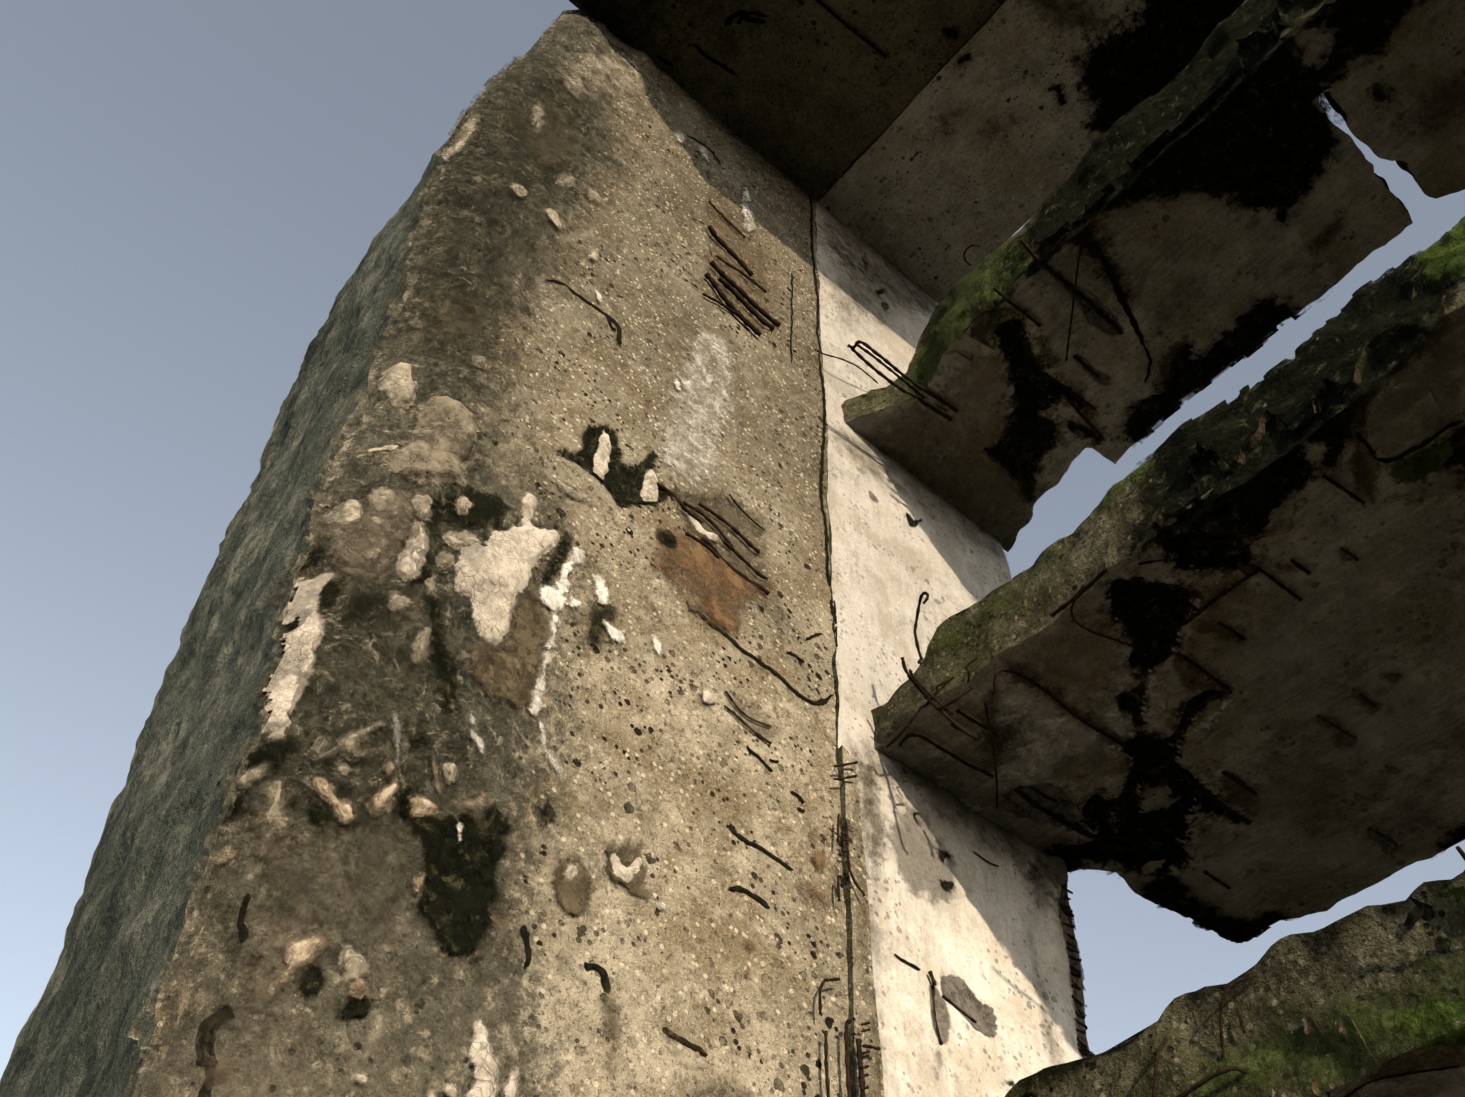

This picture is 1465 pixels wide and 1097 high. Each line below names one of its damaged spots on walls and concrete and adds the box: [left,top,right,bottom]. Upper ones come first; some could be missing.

crack [1094,245,1152,384]
damp [824,0,1427,532]
damp [1121,241,1458,560]
peeling [246,487,560,740]
damp [123,0,711,1097]
spalling [557,424,772,596]
peeling [217,768,298,867]
peeling [313,721,458,824]
spalling [606,840,666,908]
damp [1140,871,1290,943]
crack [1403,897,1435,929]
crack [1326,1065,1460,1097]